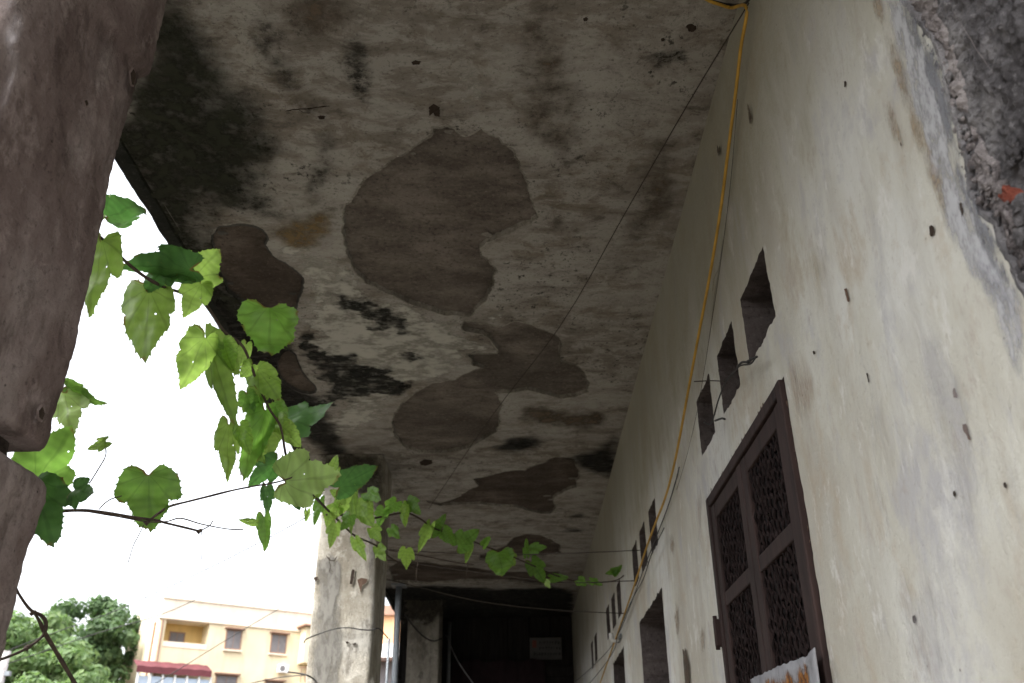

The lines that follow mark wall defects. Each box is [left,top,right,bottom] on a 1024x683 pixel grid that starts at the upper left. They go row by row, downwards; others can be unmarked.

mould [345,42,368,100]
water stain [120,9,274,253]
spalling [899,0,1024,297]
spalling [211,223,305,310]
spalling [341,102,590,466]
spalling [276,349,317,394]
water stain [211,215,486,494]
spalling [426,457,580,514]
water stain [497,438,538,450]
water stain [525,408,604,428]
water stain [570,441,616,477]